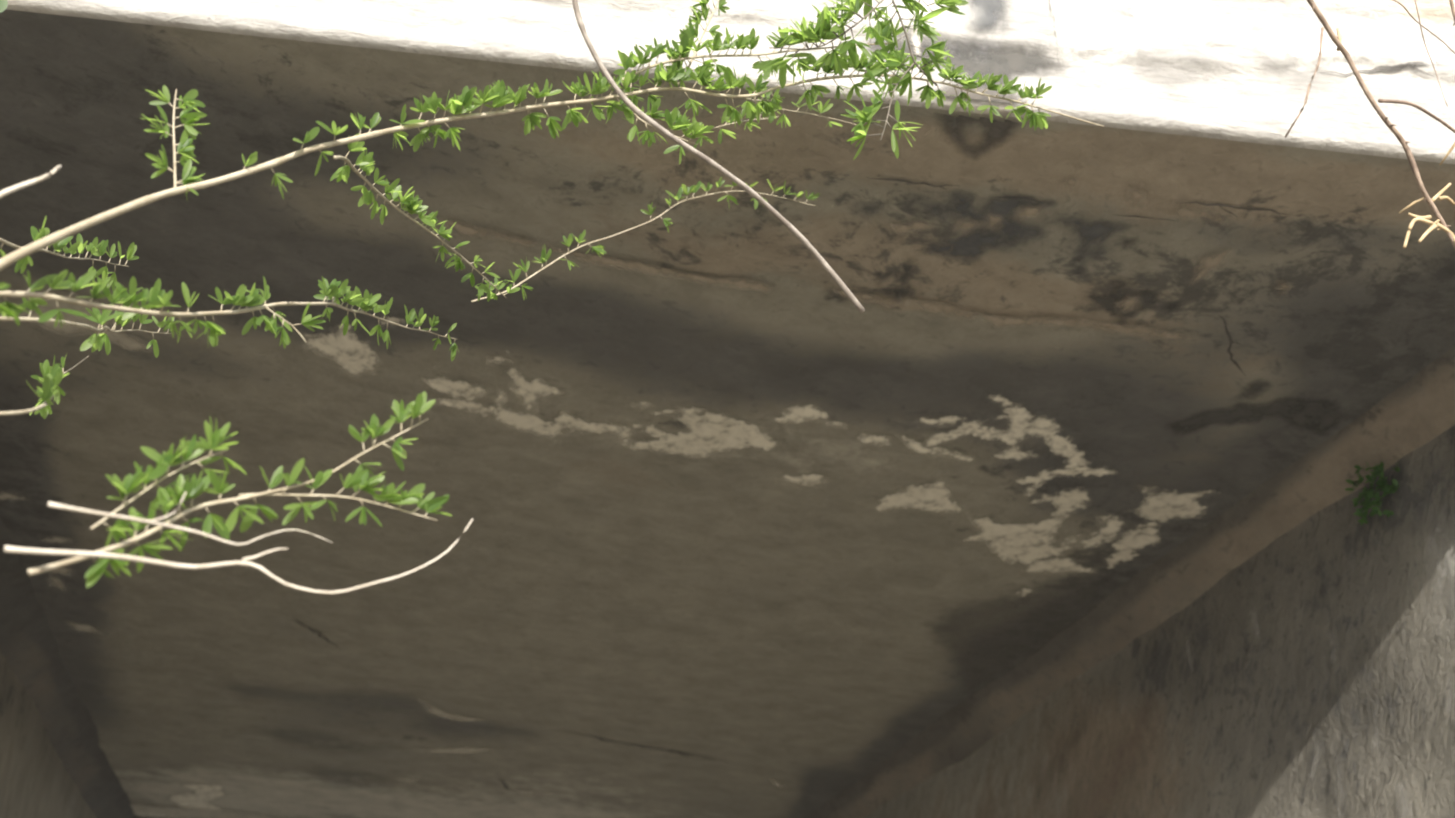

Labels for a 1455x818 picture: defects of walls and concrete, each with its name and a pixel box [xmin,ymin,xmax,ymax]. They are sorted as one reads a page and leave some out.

leakage [861,0,1060,155]
leakage [1260,36,1375,69]
leakage [917,193,1050,260]
leakage [1065,220,1134,270]
peeling [306,324,376,374]
peeling [424,357,842,457]
peeling [858,395,1211,596]